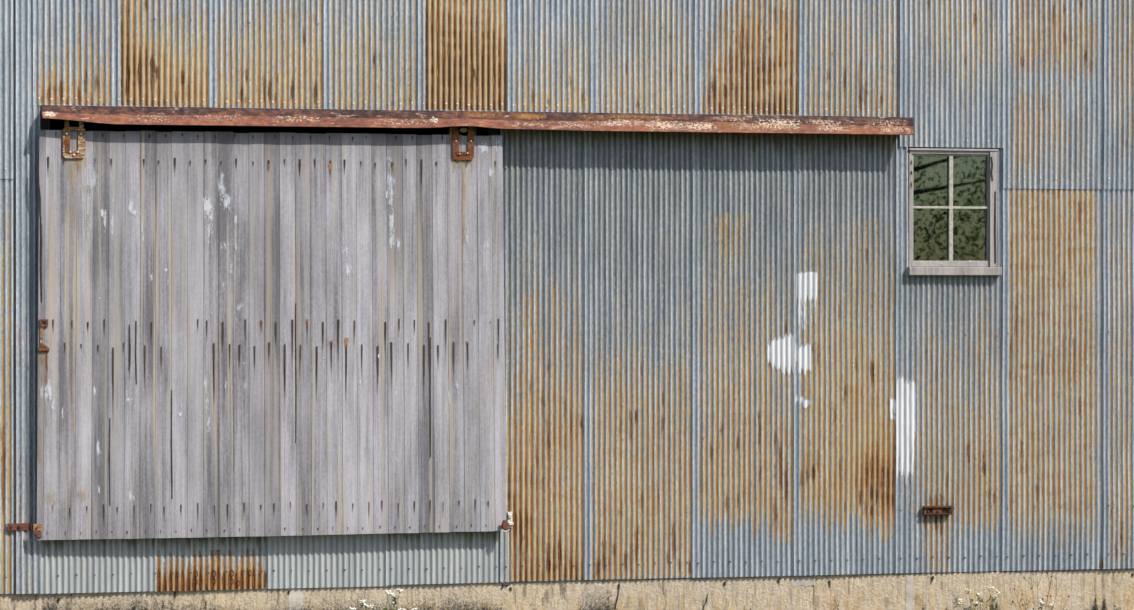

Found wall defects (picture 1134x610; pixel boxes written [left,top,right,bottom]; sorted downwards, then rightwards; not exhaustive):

rust [36,0,898,139]
rust [1111,0,1134,158]
rust [913,0,1096,583]
rust [0,200,33,593]
rust [506,213,896,591]
rust [1099,198,1133,568]
water stain [34,591,224,610]
rust [156,549,267,598]
water stain [301,601,501,610]
water stain [581,596,614,610]